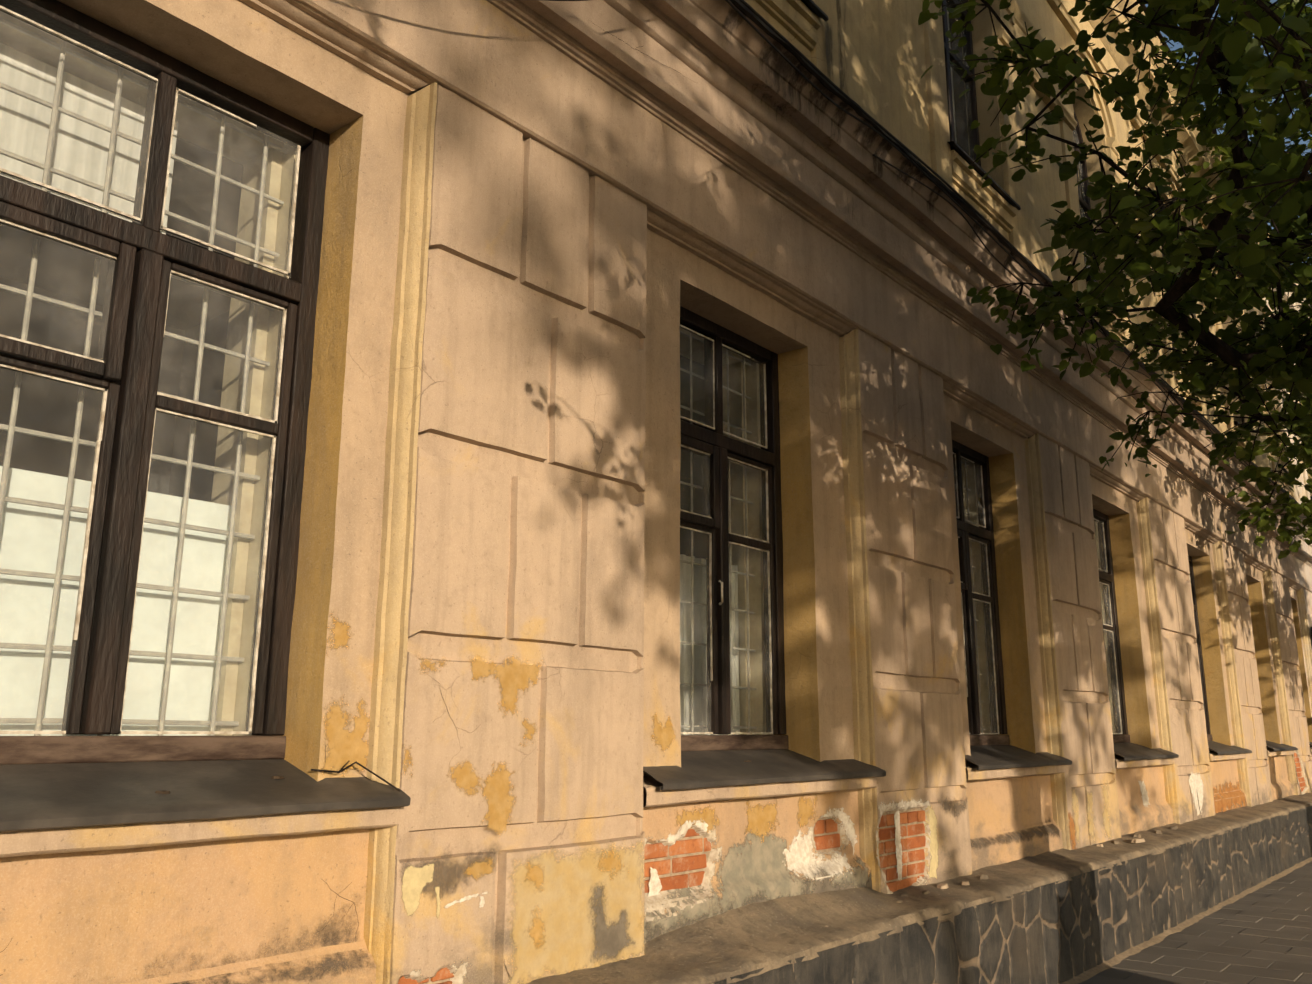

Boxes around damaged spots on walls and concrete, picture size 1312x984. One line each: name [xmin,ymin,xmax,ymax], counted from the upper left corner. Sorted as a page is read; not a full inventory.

peeling [327,617,350,649]
peeling [321,700,370,772]
peeling [471,656,542,746]
peeling [451,761,517,834]
peeling [746,800,779,842]
spalling [782,796,858,881]
spalling [872,798,939,894]
peeling [401,859,493,918]
peeling [507,807,722,984]
water stain [591,833,872,961]
spalling [398,960,471,984]